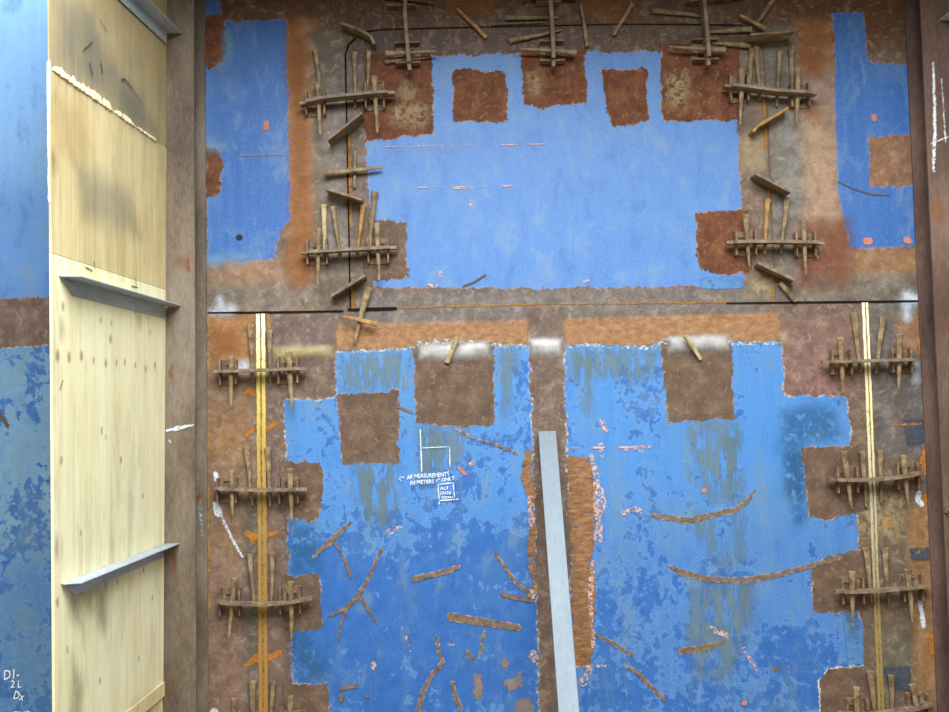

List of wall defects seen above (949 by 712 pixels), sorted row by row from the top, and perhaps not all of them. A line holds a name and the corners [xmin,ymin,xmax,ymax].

peeling [114,110,157,142]
rust [564,443,610,668]